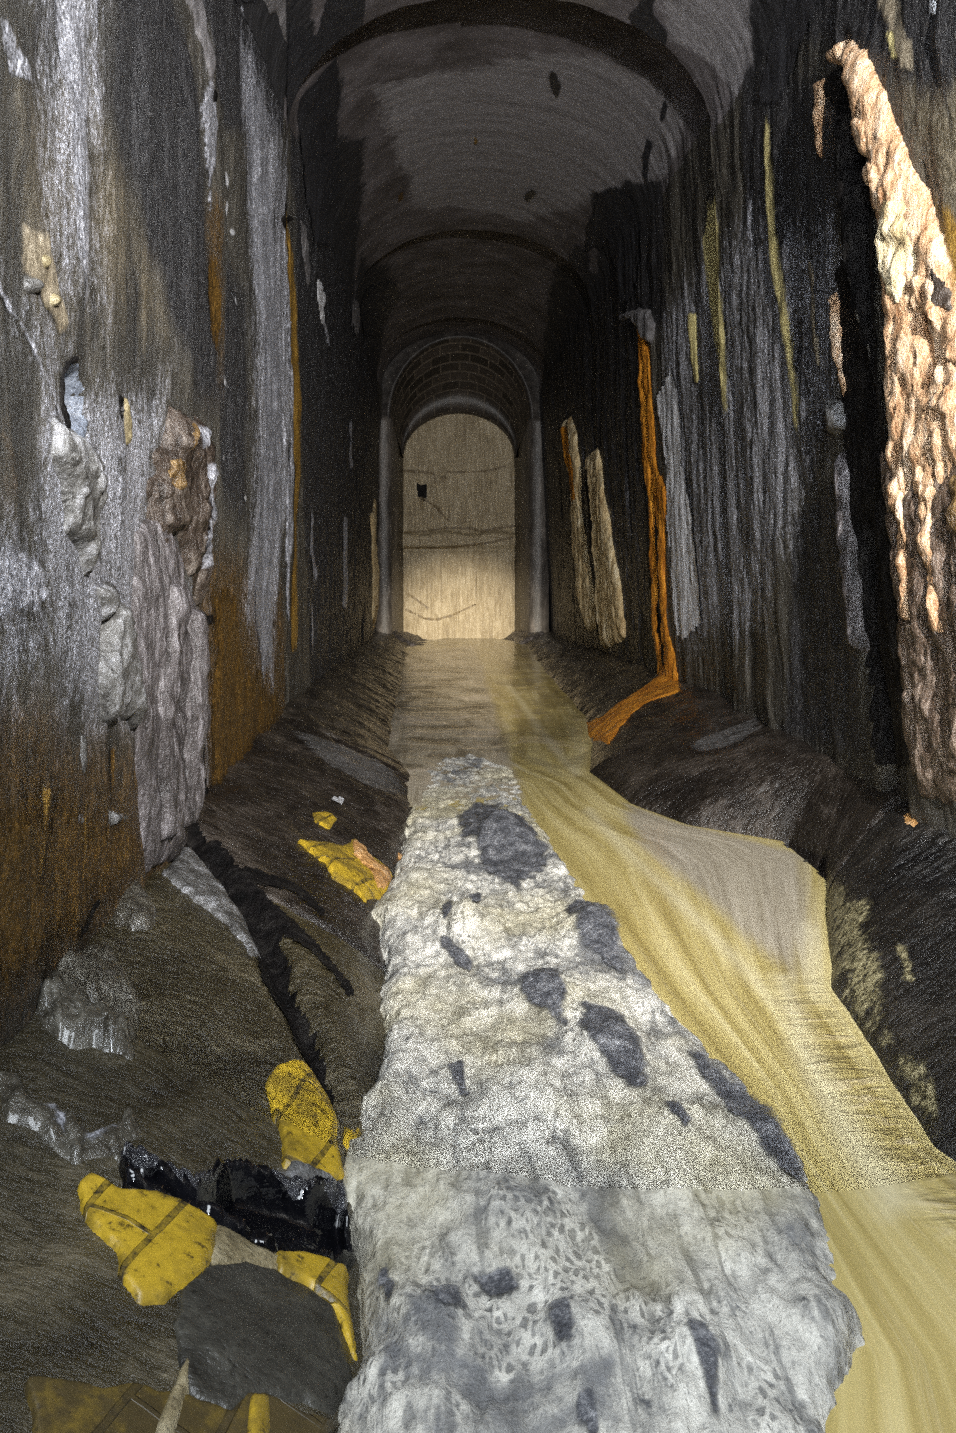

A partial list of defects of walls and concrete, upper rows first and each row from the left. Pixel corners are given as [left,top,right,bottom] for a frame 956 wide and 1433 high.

efflorescence [55,0,89,298]
hole [119,395,133,445]
spalling [146,406,219,606]
corrosion [281,203,302,651]
corrosion [586,329,680,744]